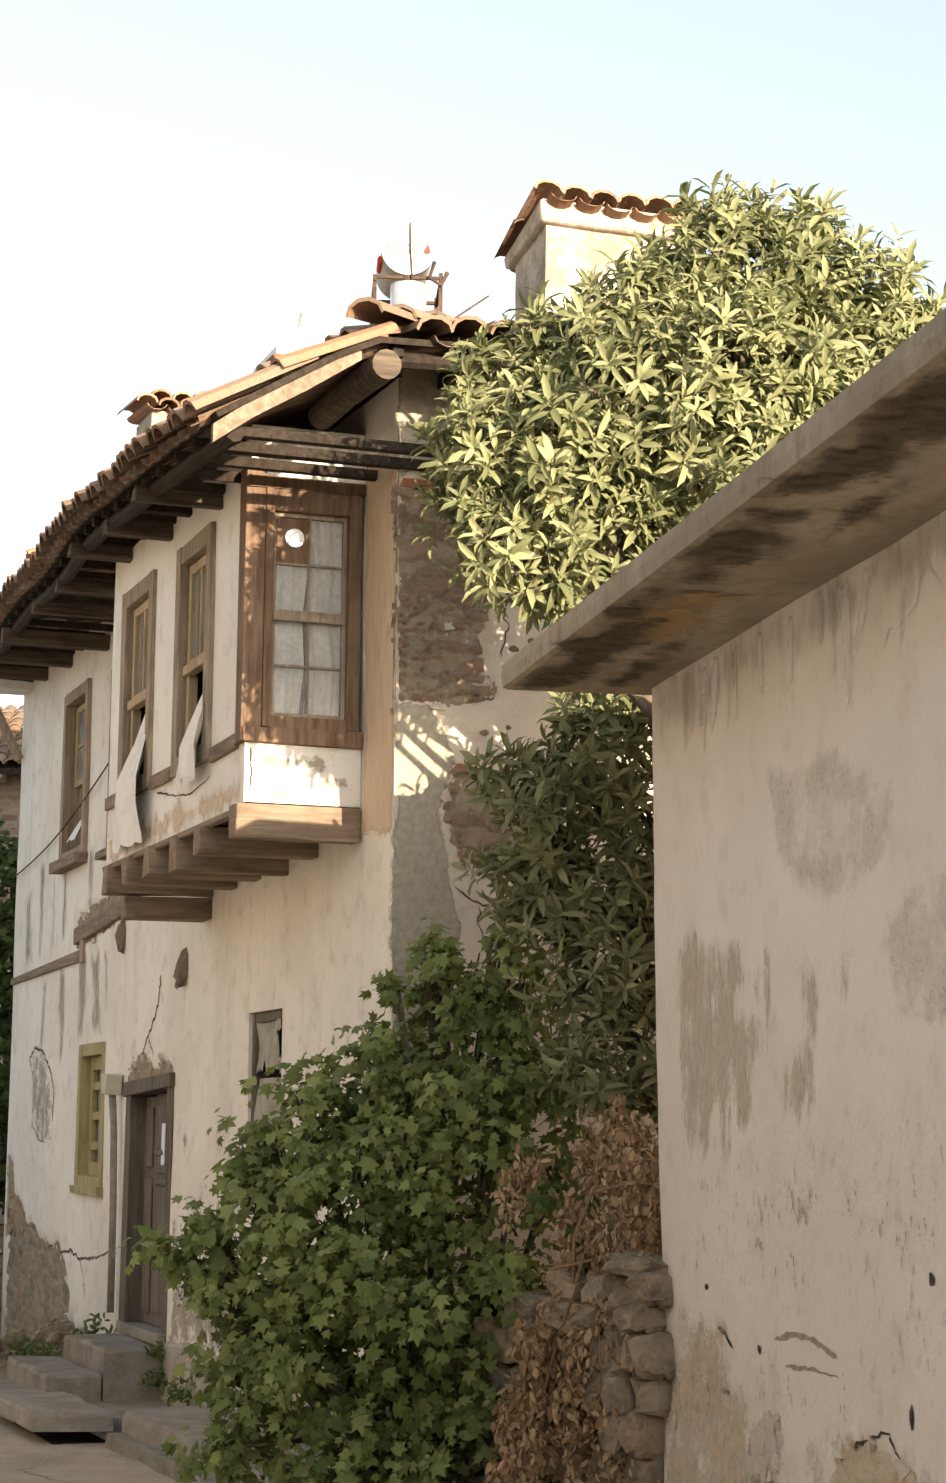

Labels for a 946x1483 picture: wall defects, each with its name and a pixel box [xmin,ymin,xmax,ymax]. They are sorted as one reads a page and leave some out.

flaking render [390,482,506,716]
flaking render [439,763,523,869]
flaking render [29,1047,54,1142]
flaking render [4,1155,70,1335]
flaking render [170,1276,228,1352]
flaking render [830,1434,937,1483]